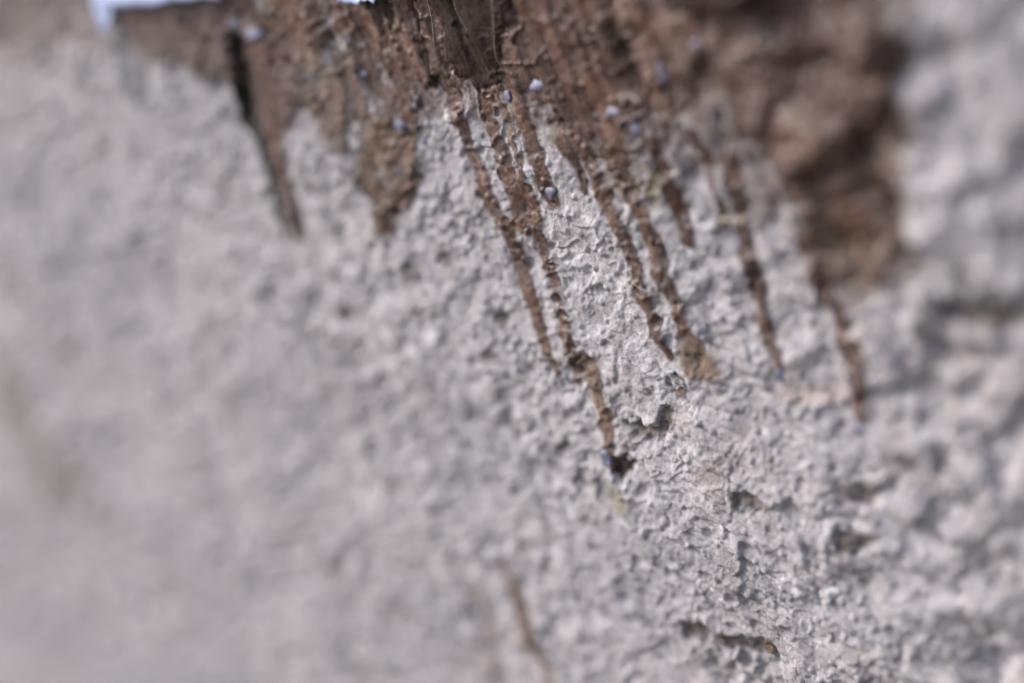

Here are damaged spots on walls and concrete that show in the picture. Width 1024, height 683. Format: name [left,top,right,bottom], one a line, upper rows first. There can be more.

corrosion [675,342,720,397]